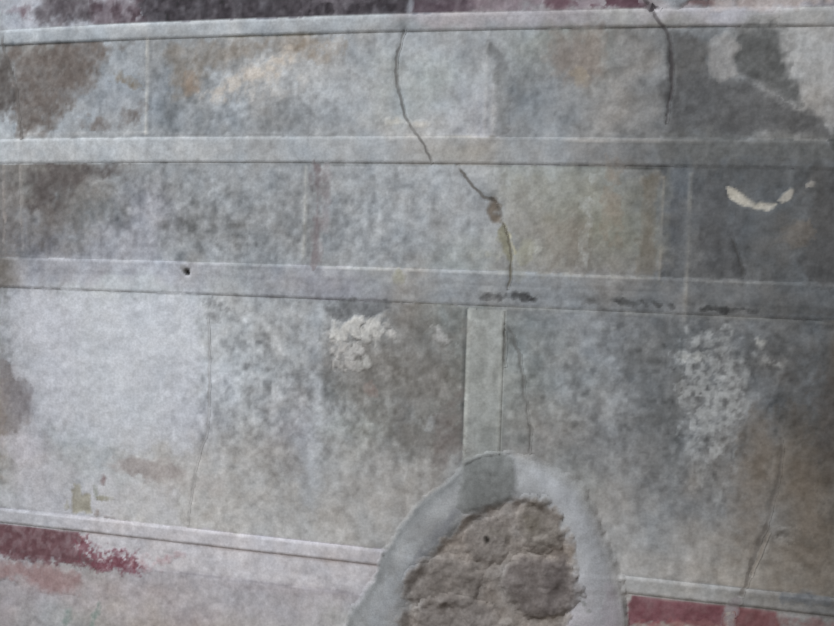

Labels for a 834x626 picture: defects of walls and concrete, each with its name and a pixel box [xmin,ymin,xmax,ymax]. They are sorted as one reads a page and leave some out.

crack [393,29,433,164]
crack [643,0,675,124]
crack [456,165,513,290]
damp [467,15,834,574]
spalling [725,179,816,212]
damp [290,292,510,522]
flaking render [393,493,587,626]
crack [719,439,785,626]